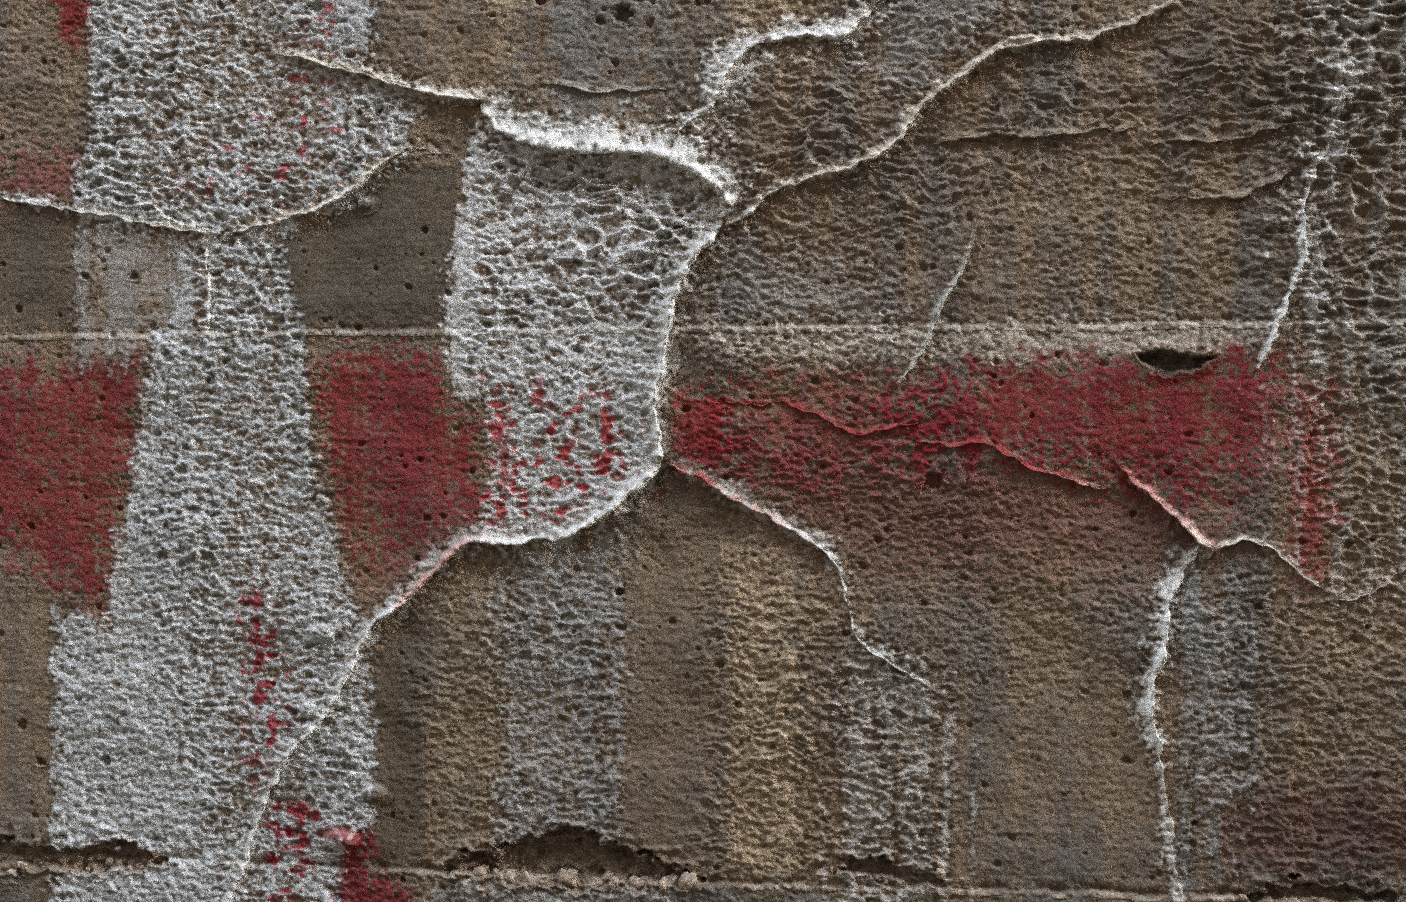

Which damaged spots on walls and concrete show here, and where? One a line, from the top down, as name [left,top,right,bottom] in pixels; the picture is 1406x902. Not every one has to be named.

crack [0,137,451,331]
crack [201,0,1189,902]
crack [722,398,1406,902]
crack [933,61,1347,370]